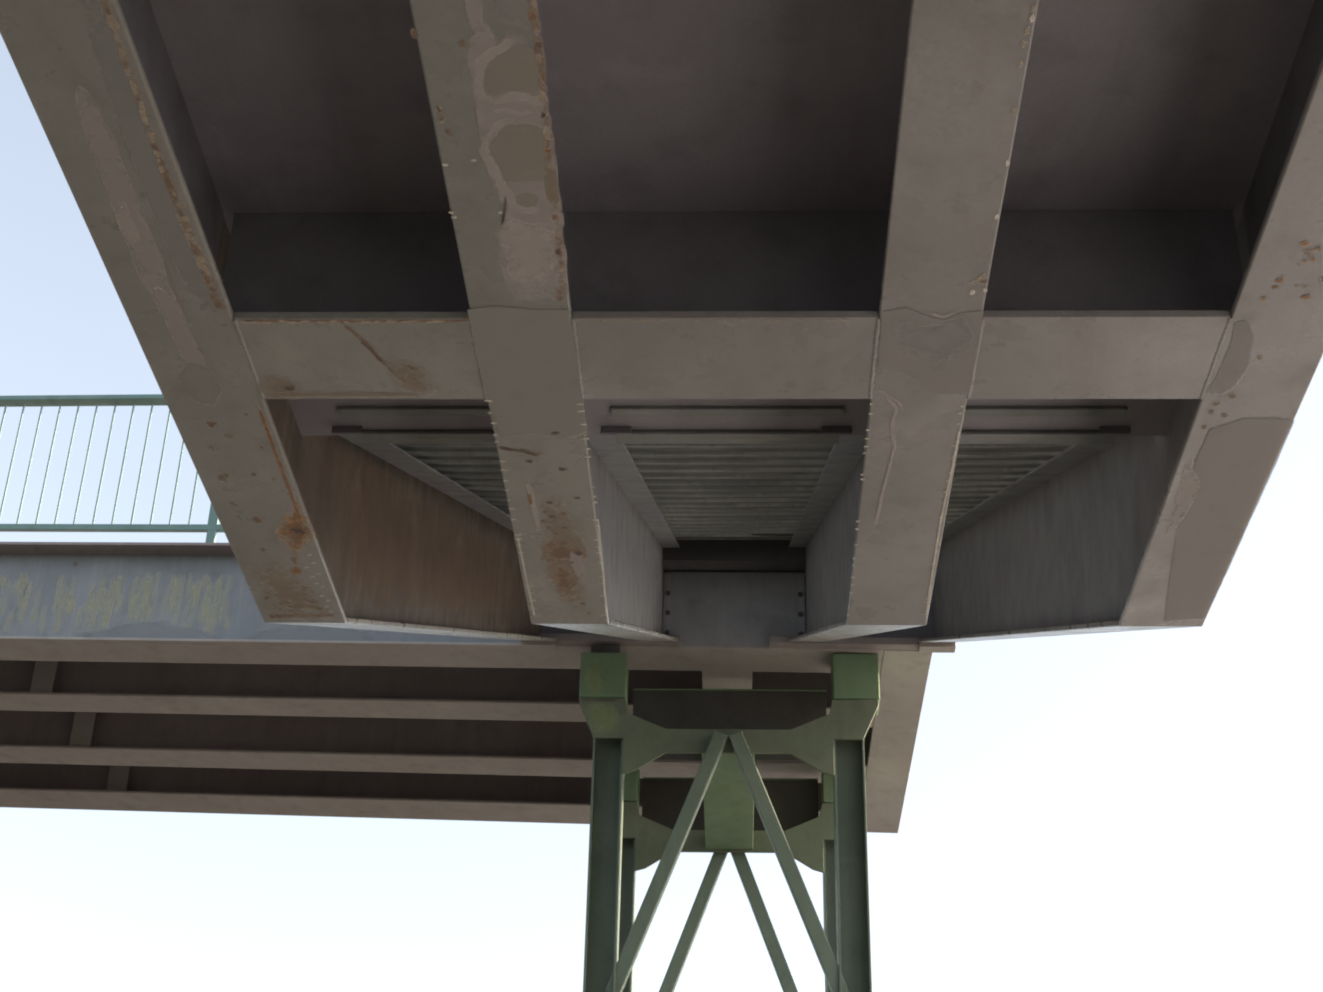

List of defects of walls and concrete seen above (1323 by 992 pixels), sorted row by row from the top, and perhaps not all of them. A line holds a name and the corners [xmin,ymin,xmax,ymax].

rust [101,0,224,309]
peeling [465,0,591,457]
rust [528,0,568,301]
rust [239,319,469,393]
water stain [0,574,231,644]
rust [243,411,313,575]
rust [526,483,591,614]